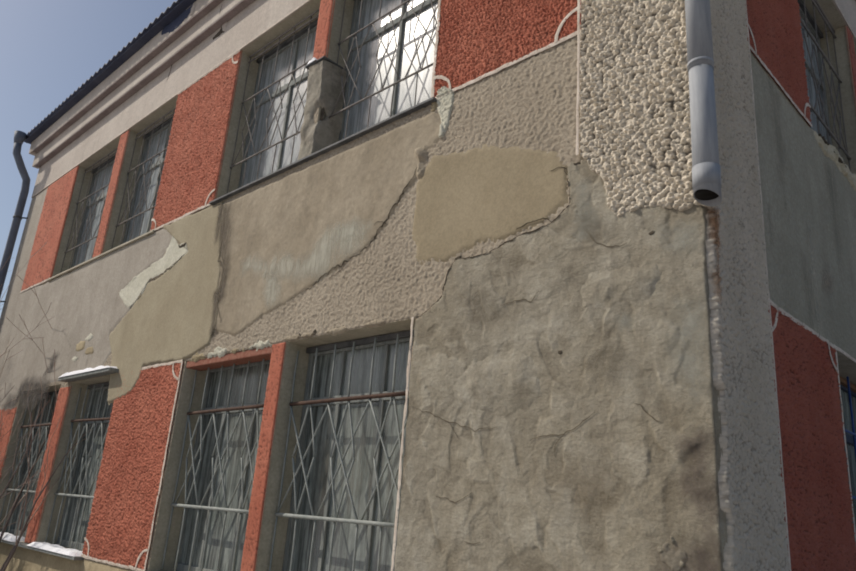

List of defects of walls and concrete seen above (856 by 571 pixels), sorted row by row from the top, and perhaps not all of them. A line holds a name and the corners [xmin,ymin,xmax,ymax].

peeling [119,236,188,308]
water stain [211,205,229,335]
crack [217,201,226,322]
crack [293,170,416,298]
crack [414,166,570,322]
crack [411,406,495,436]